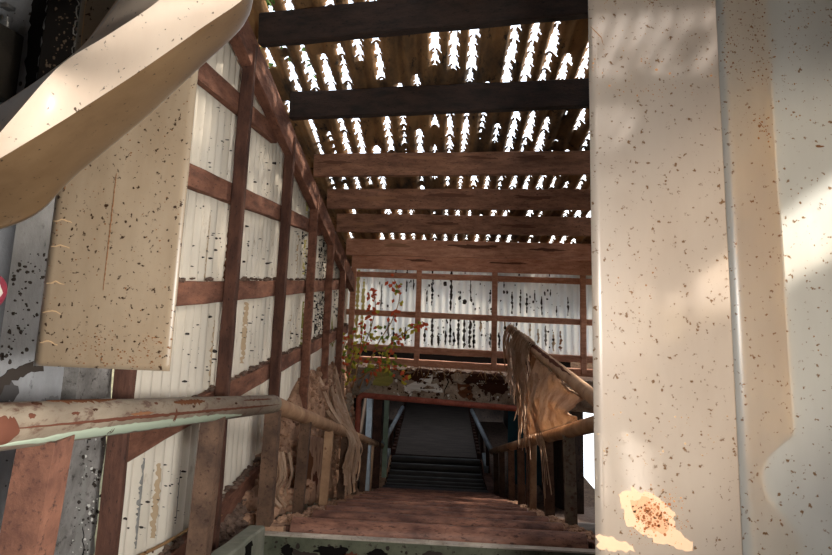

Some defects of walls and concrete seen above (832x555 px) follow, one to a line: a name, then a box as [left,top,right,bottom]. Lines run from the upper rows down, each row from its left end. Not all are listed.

spalling [0,381,19,402]
corrosion [618,484,693,552]
peeling [274,541,350,555]
peeling [366,546,390,555]